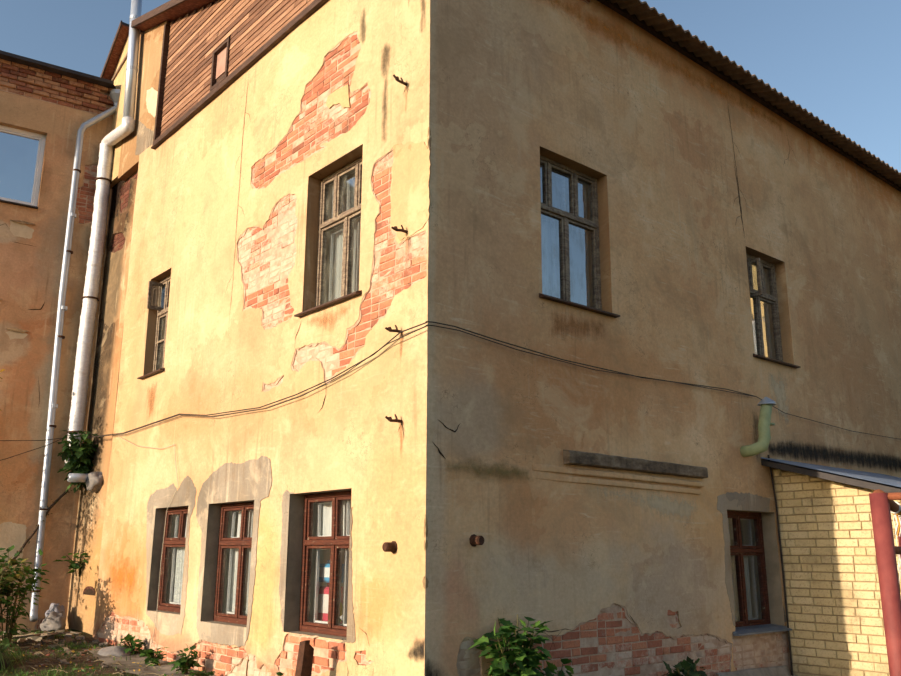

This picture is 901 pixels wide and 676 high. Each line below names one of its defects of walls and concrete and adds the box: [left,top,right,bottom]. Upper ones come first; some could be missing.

spalling [251,31,371,190]
crack [726,90,747,243]
flaking render [10,220,36,239]
spalling [236,194,298,330]
spalling [262,148,427,392]
damp [769,442,901,471]
spalling [96,611,374,676]
damp [409,641,438,676]
spalling [527,603,791,676]